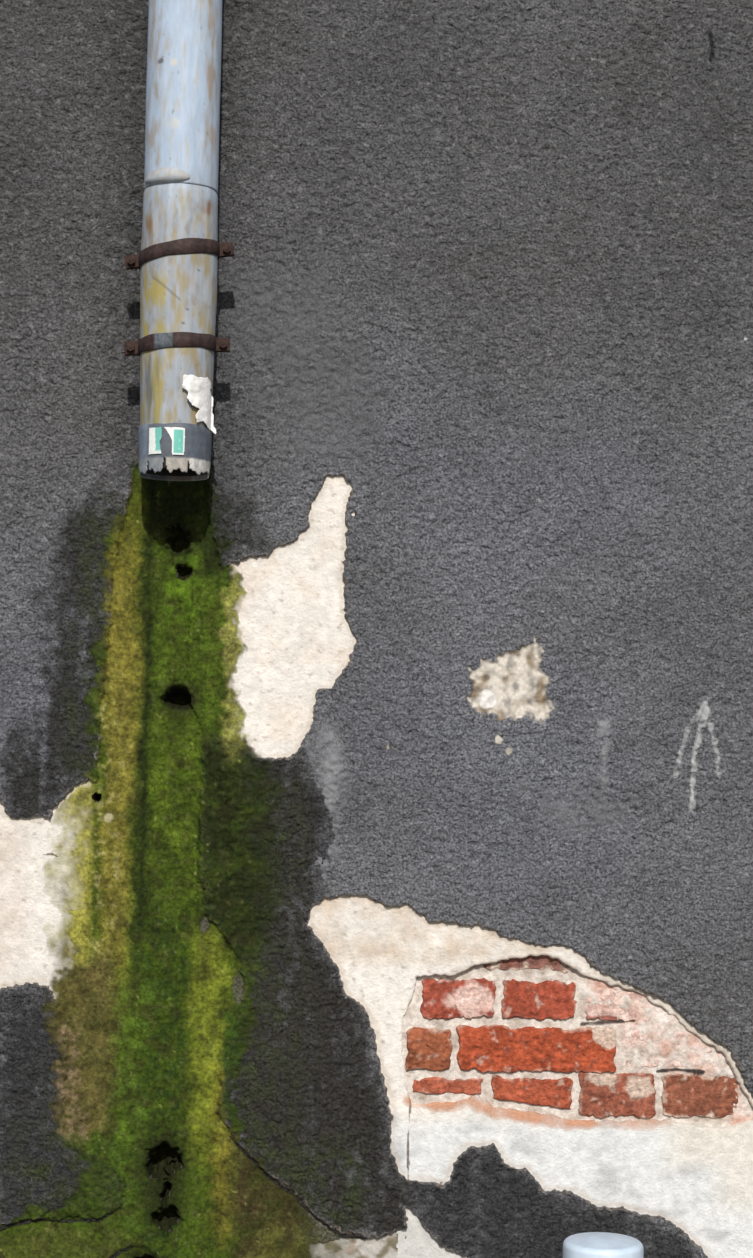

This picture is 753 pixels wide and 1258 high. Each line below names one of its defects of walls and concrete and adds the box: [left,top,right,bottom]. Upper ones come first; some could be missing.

leakage [5,503,124,818]
flaking render [229,476,356,759]
spalling [467,638,554,755]
flaking render [0,780,114,999]
leakage [0,991,91,1222]
flaking render [307,895,753,1258]